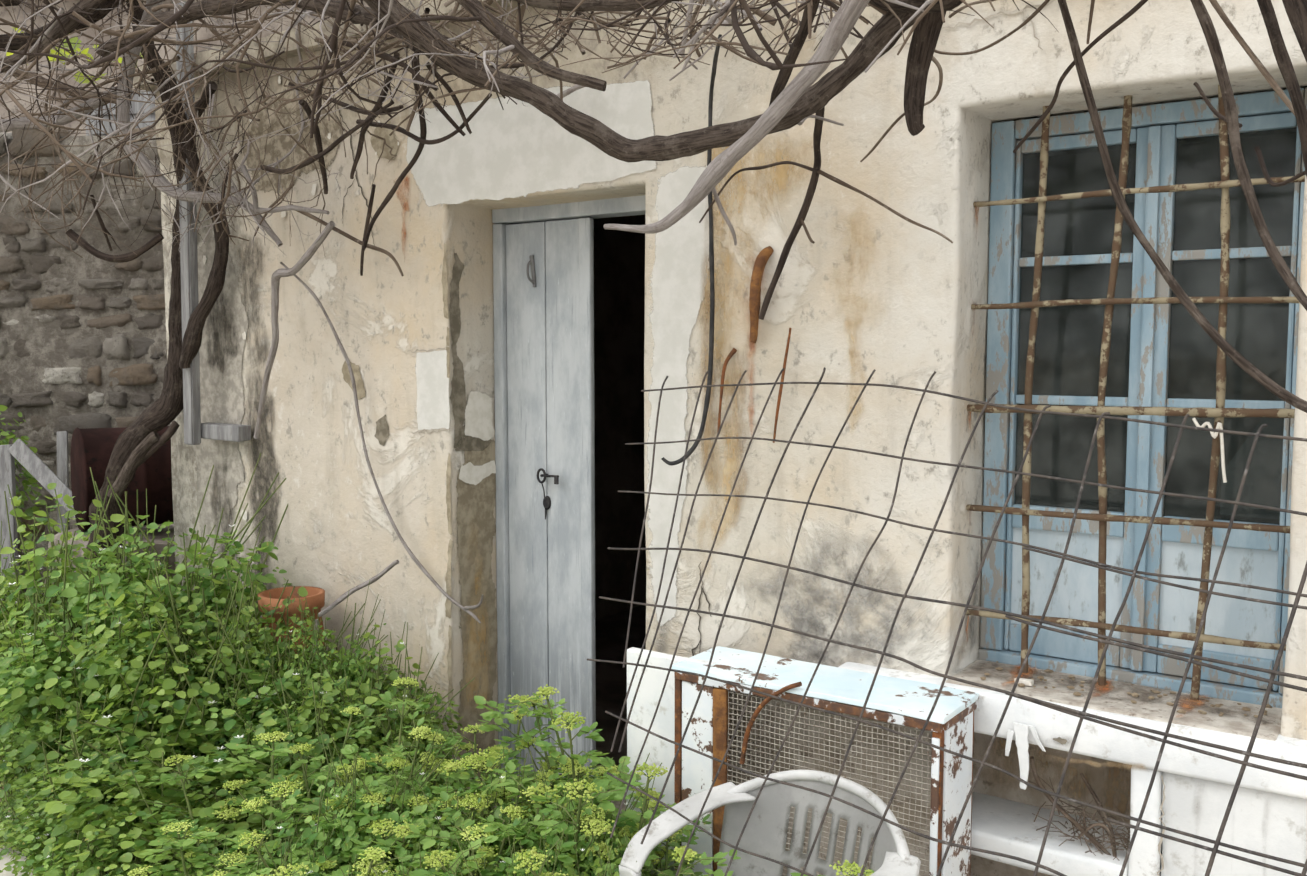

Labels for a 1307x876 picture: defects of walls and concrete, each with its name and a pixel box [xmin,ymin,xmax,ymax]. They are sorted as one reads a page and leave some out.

leakage [208,243,279,590]
peeling [342,361,366,400]
peeling [375,415,389,446]
peeling [442,243,498,794]
leakage [759,546,910,659]